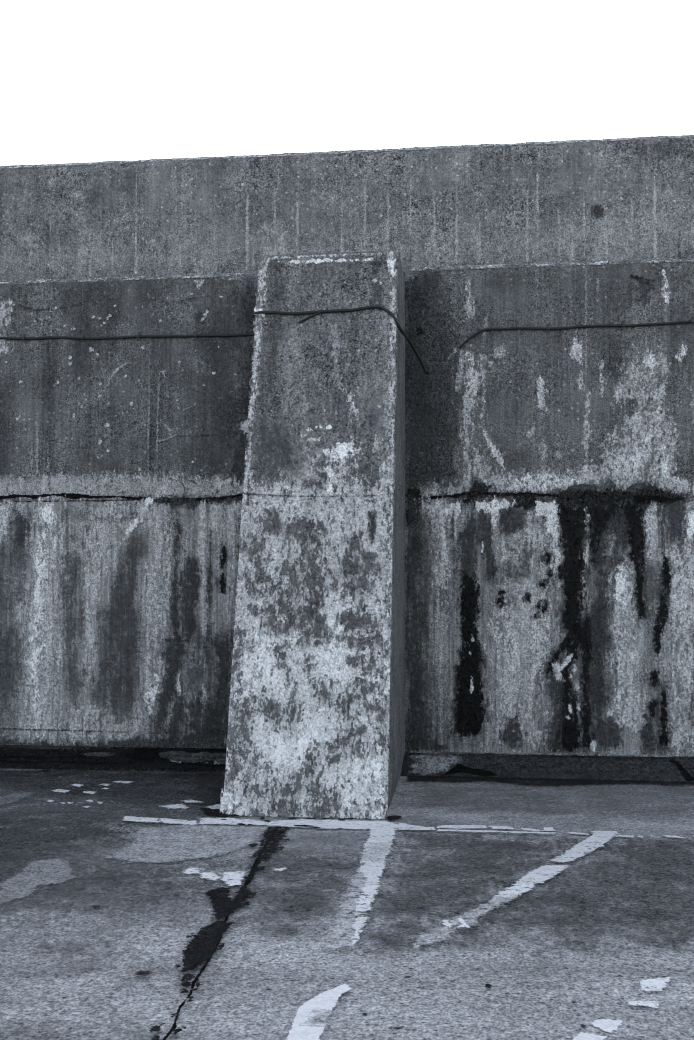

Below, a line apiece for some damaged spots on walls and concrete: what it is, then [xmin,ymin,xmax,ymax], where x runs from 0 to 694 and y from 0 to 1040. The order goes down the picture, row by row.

water stain [661,269,670,304]
water stain [0,277,694,975]
crack [149,814,371,1040]